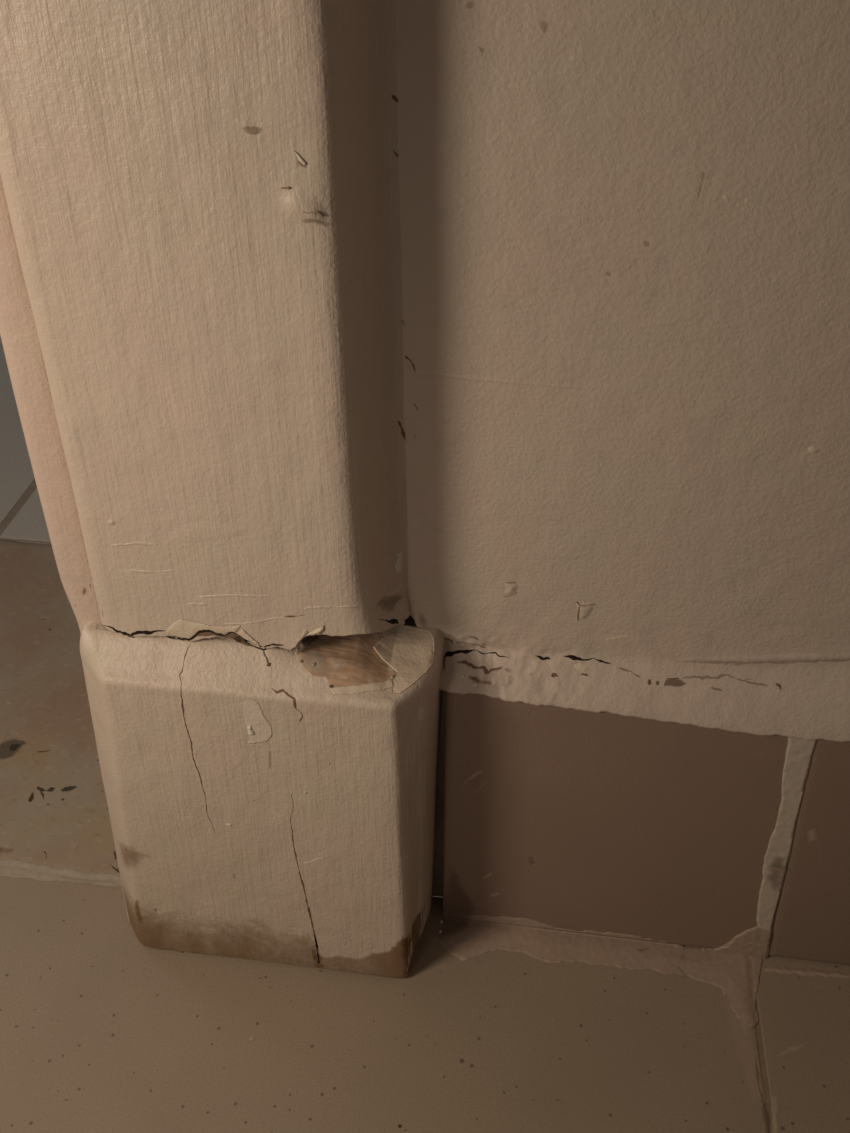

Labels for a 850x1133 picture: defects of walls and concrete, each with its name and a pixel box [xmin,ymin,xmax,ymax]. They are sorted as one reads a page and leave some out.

crack [97,603,303,830]
peeling [291,626,434,694]
crack [443,636,515,688]
crack [535,655,641,678]
crack [688,674,781,691]
crack [290,793,320,963]